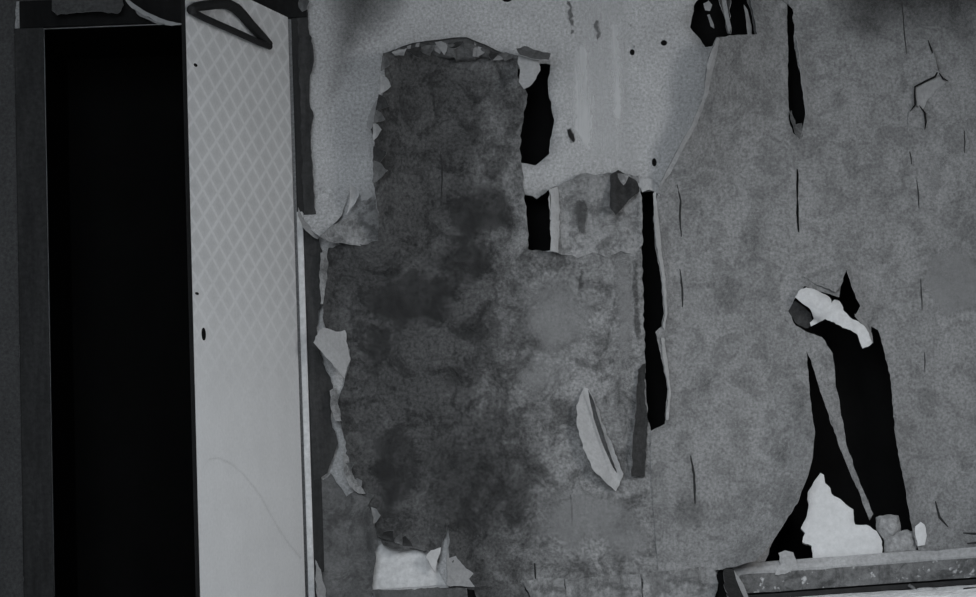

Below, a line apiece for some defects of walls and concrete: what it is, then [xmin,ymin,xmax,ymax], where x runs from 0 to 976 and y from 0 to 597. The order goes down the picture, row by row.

spalling [690,0,757,47]
spalling [782,0,805,135]
spalling [517,46,554,165]
peeling [303,185,379,246]
spalling [524,190,551,251]
water stain [576,202,587,233]
spalling [641,192,668,431]
peeling [313,328,351,379]
peeling [576,387,623,491]
spalling [765,270,913,575]
flaking render [372,526,475,590]